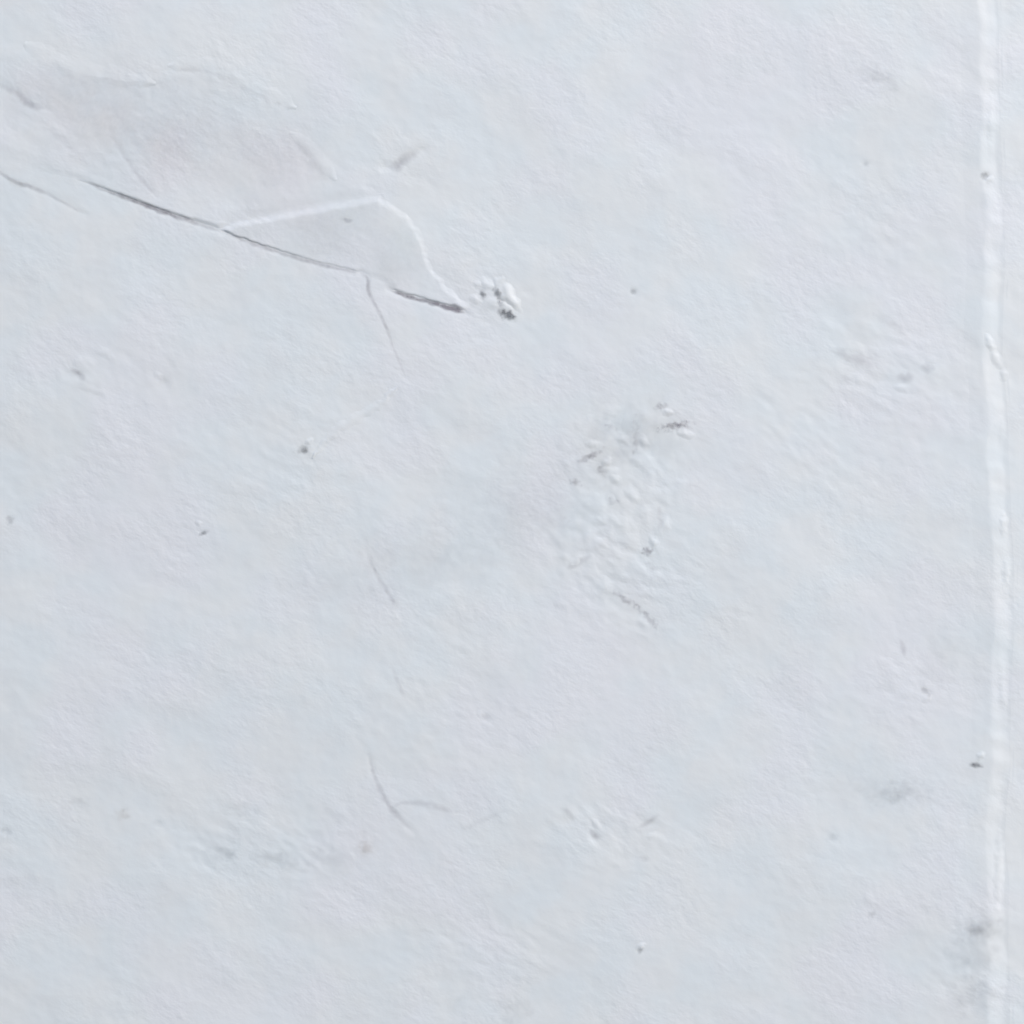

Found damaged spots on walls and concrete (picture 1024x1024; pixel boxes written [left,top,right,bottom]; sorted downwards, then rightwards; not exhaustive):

crack [406,296,460,312]
spalling [468,275,523,318]